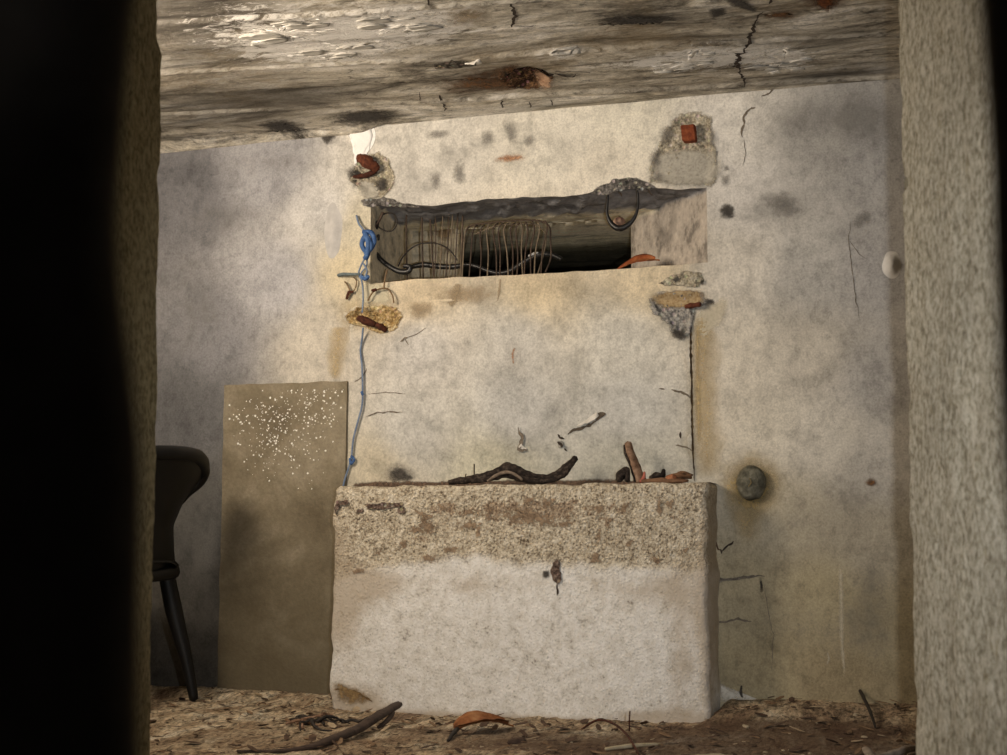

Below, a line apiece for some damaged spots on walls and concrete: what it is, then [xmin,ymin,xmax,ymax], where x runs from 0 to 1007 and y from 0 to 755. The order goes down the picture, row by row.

crack [510,4,536,27]
crack [729,0,773,166]
spalling [348,152,419,208]
spalling [590,112,719,197]
spalling [345,305,403,333]
spalling [649,271,714,340]